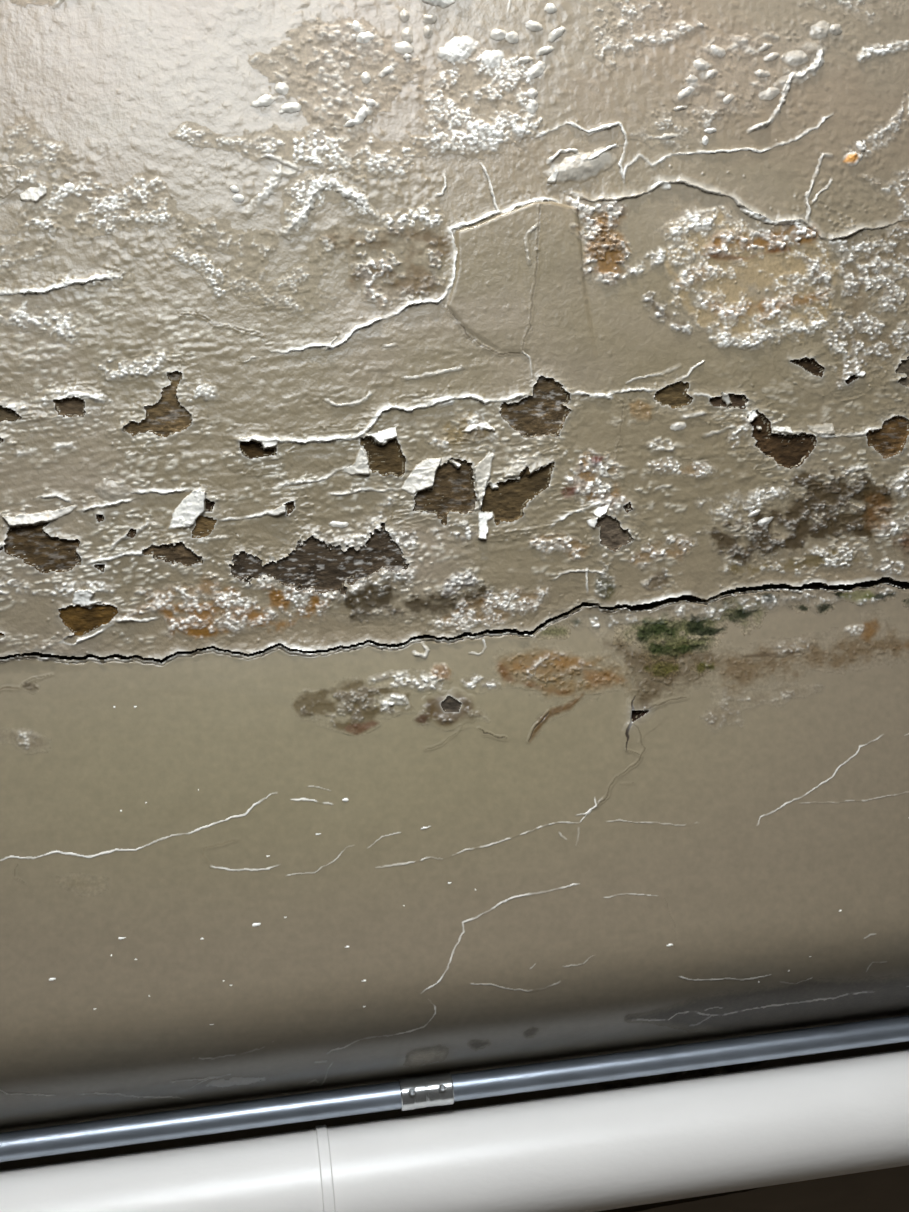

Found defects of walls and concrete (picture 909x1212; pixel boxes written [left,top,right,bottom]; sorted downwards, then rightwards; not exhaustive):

spalling [625,336,909,486]
spalling [0,352,673,636]
spalling [290,676,491,733]
crack [0,560,909,695]
rust [487,638,625,745]
peeling [569,585,901,638]
crack [0,738,700,877]
crack [756,733,909,826]
crack [305,883,888,1088]